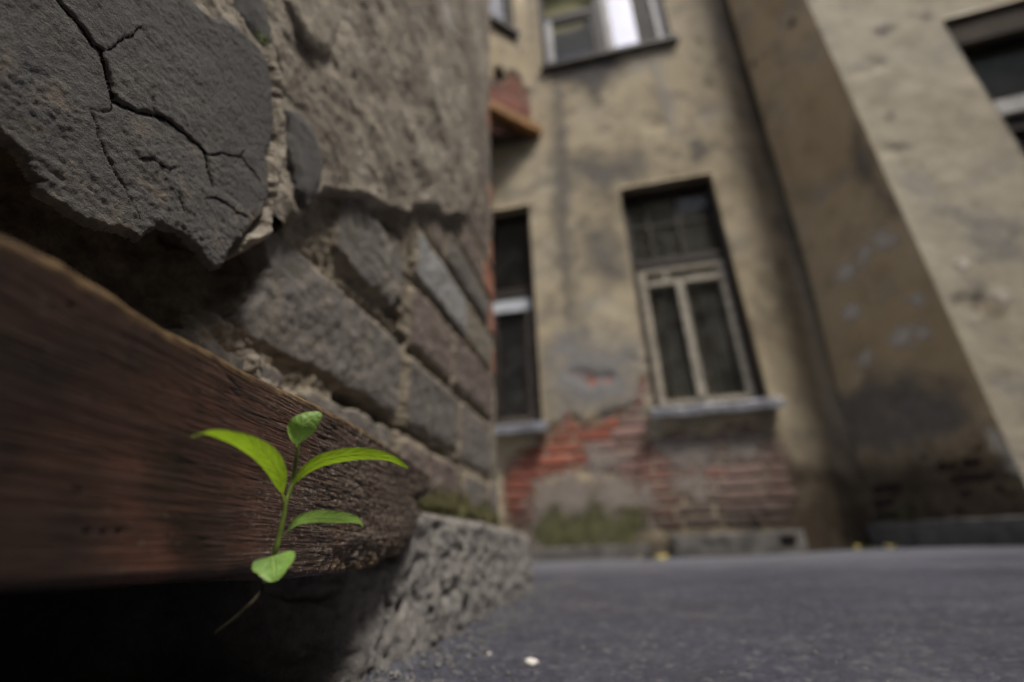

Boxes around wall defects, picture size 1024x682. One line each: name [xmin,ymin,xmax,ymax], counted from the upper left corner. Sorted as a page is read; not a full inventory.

crack [56,0,260,220]
flaking render [499,406,650,533]